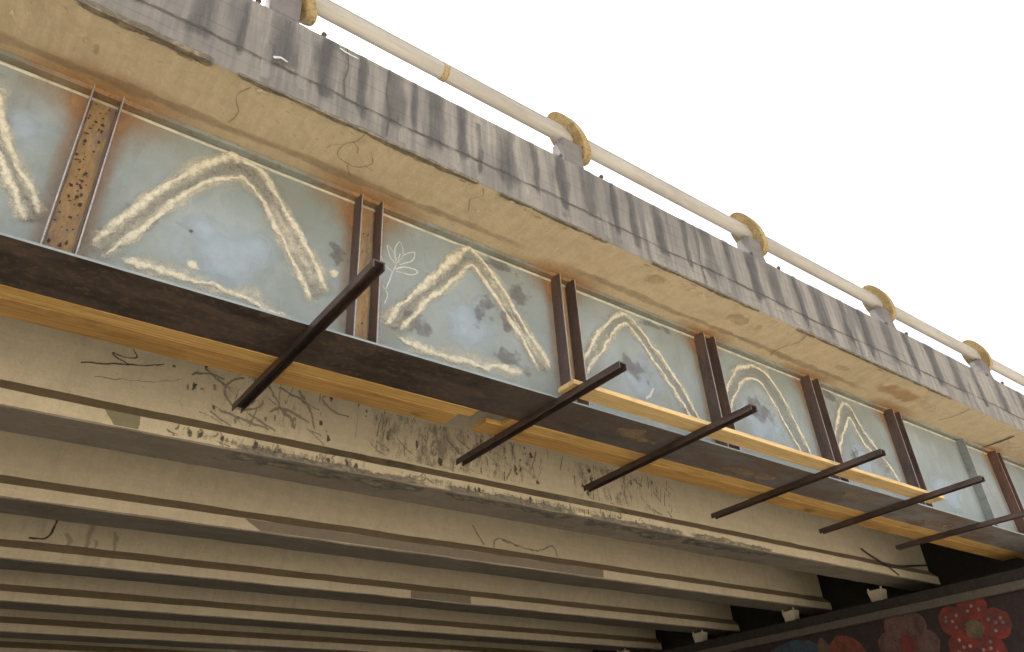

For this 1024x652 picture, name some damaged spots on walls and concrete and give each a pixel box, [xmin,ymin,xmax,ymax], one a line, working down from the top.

rust [44,70,145,253]
water stain [319,36,337,95]
water stain [357,55,367,114]
water stain [401,80,417,125]
water stain [431,90,443,142]
water stain [460,111,482,171]
water stain [556,155,568,208]
crack [140,0,1024,447]
water stain [610,182,640,241]
water stain [654,206,668,253]
spalling [167,384,771,555]
crack [29,520,58,540]